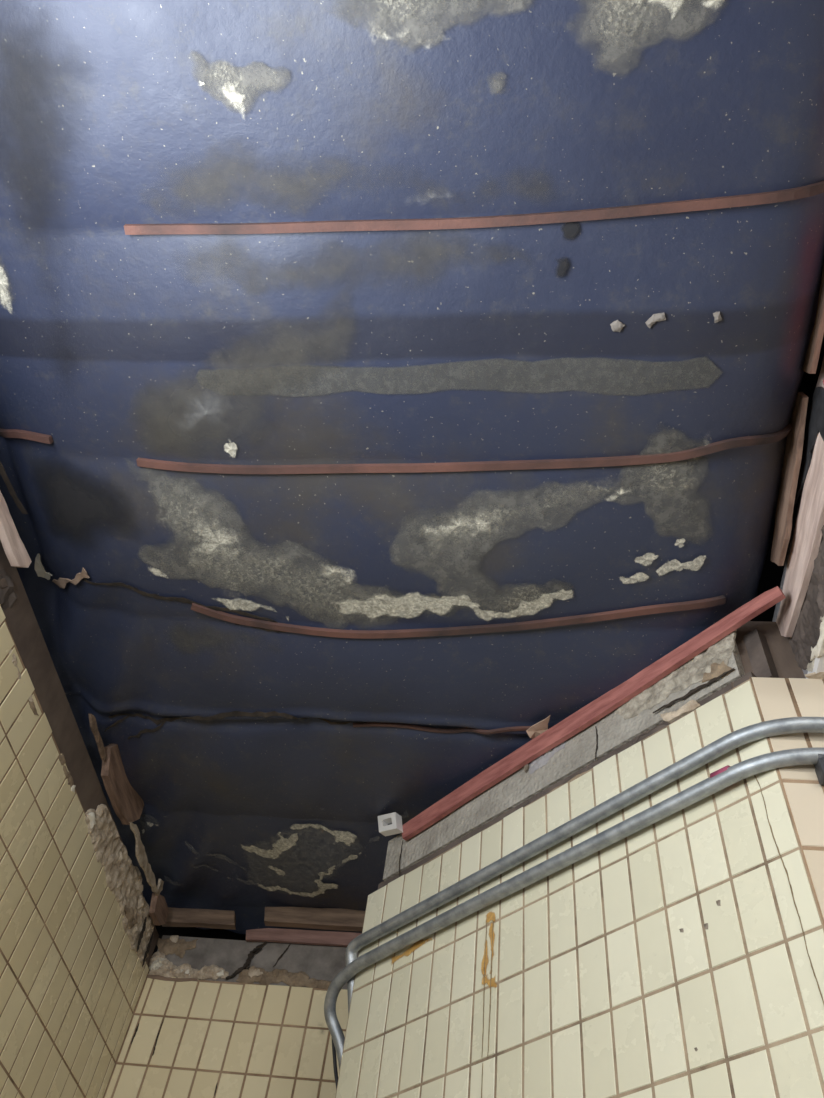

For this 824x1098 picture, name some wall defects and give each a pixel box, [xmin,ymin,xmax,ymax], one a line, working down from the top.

damp [340,0,531,47]
damp [580,0,721,72]
damp [192,53,289,110]
peeling [610,320,625,332]
peeling [645,313,666,328]
damp [139,430,708,627]
crack [82,578,283,633]
spalling [789,525,824,679]
crack [104,711,365,740]
spalling [85,804,331,989]
crack [225,942,291,980]
corrosion [481,912,497,987]